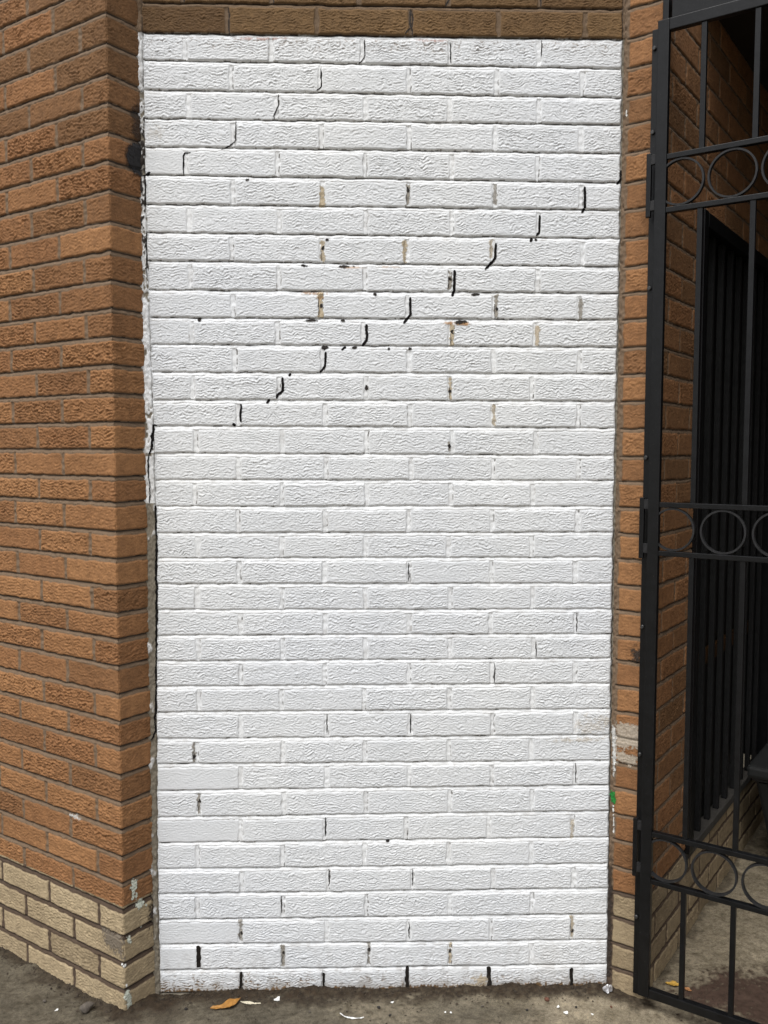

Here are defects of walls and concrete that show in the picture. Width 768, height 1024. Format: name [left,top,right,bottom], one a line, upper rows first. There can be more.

crack [579,186,587,213]
crack [530,215,541,242]
crack [485,243,497,270]
crack [449,270,457,297]
crack [403,297,412,324]
crack [320,324,368,373]
crack [232,373,291,426]
crack [147,424,158,740]